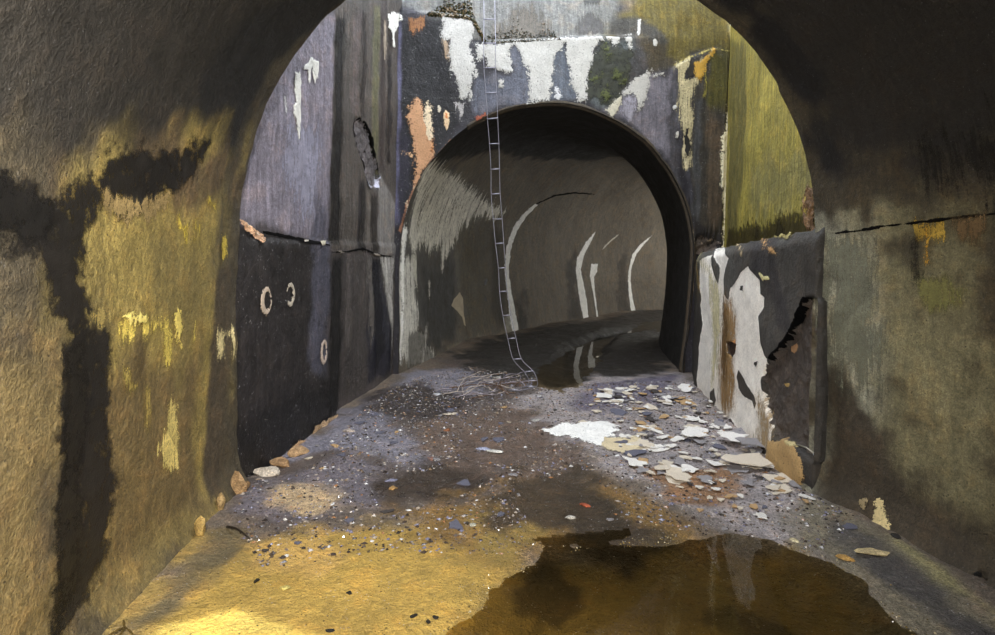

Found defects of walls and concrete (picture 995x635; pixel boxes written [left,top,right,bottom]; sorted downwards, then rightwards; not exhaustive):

water stain [439,16,633,116]
spalling [353,117,381,189]
spalling [398,187,415,234]
corrosion [401,97,450,191]
water stain [719,104,815,248]
crack [835,213,995,234]
water stain [0,138,211,635]
flaking render [589,235,817,520]